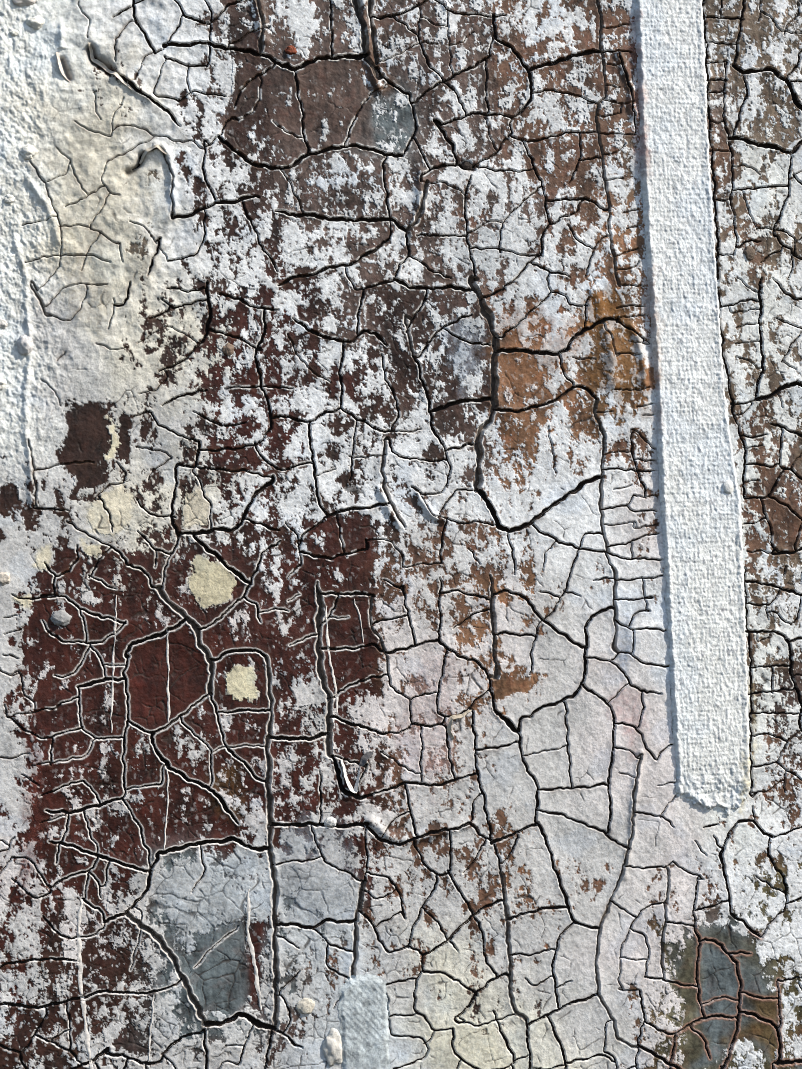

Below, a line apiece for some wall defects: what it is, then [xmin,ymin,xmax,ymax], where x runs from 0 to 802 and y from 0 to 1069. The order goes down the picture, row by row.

peeling [50,401,134,517]
peeling [0,530,278,1069]
crack [66,411,288,752]
peeling [202,277,284,490]
crack [137,282,447,578]
peeling [287,511,381,818]
peeling [220,0,636,219]
peeling [375,289,552,459]
crack [428,0,638,269]
crack [332,680,750,1069]
crack [702,0,802,555]
crack [744,568,802,798]